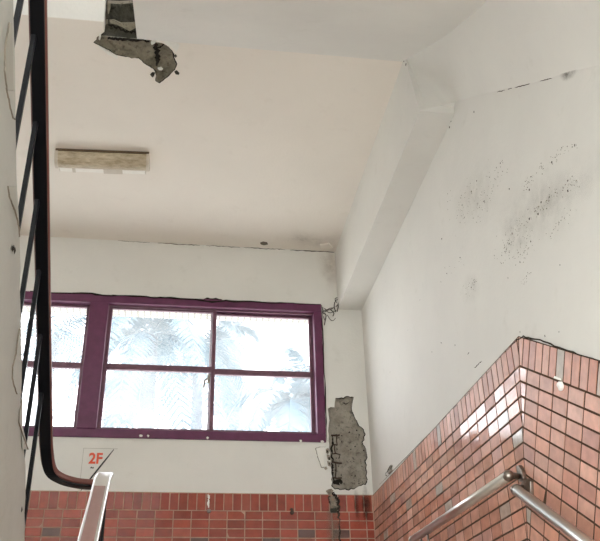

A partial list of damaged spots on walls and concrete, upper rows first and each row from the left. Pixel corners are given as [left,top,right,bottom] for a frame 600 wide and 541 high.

spalling [93,0,179,83]
spalling [315,396,368,513]